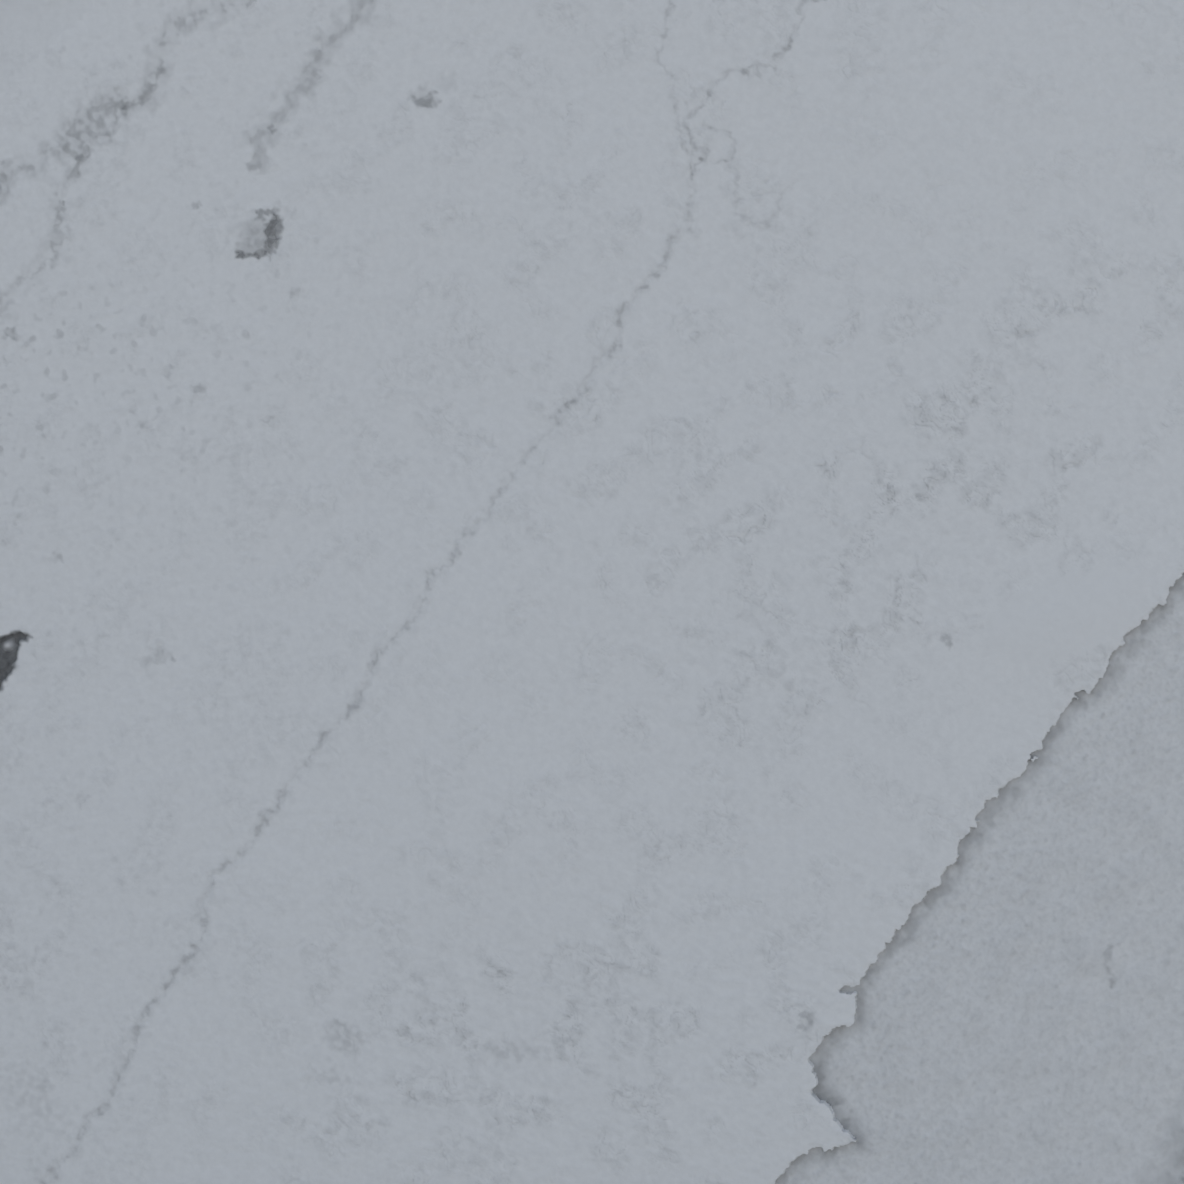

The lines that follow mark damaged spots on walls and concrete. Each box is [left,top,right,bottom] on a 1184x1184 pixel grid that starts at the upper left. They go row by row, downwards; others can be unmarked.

spalling [236,214,281,259]
spalling [0,631,28,689]
spalling [774,572,1184,1184]